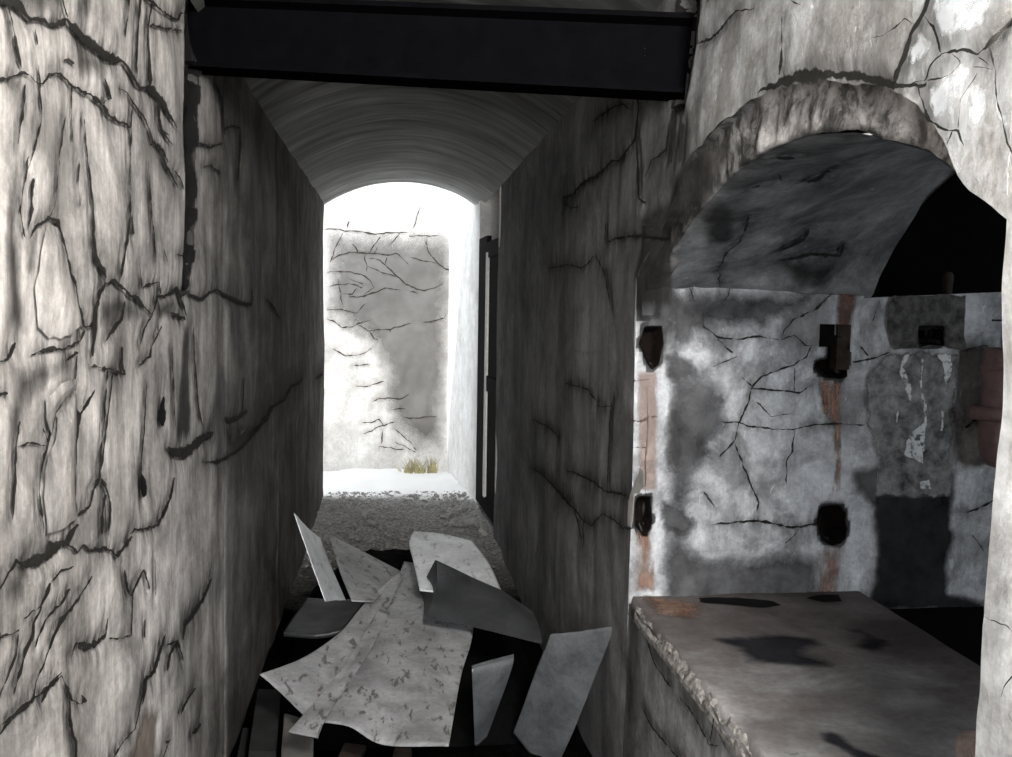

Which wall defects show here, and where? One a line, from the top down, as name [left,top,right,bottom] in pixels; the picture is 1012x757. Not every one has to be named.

crack [874,0,1012,153]
crack [0,0,323,757]
crack [325,207,449,452]
crack [703,229,863,543]
rust [821,382,841,479]
rust [838,294,855,324]
peeling [900,354,927,463]
peeling [938,354,952,383]
water stain [662,502,693,533]
spalling [633,607,764,757]
water stain [719,636,829,666]
water stain [824,732,880,757]